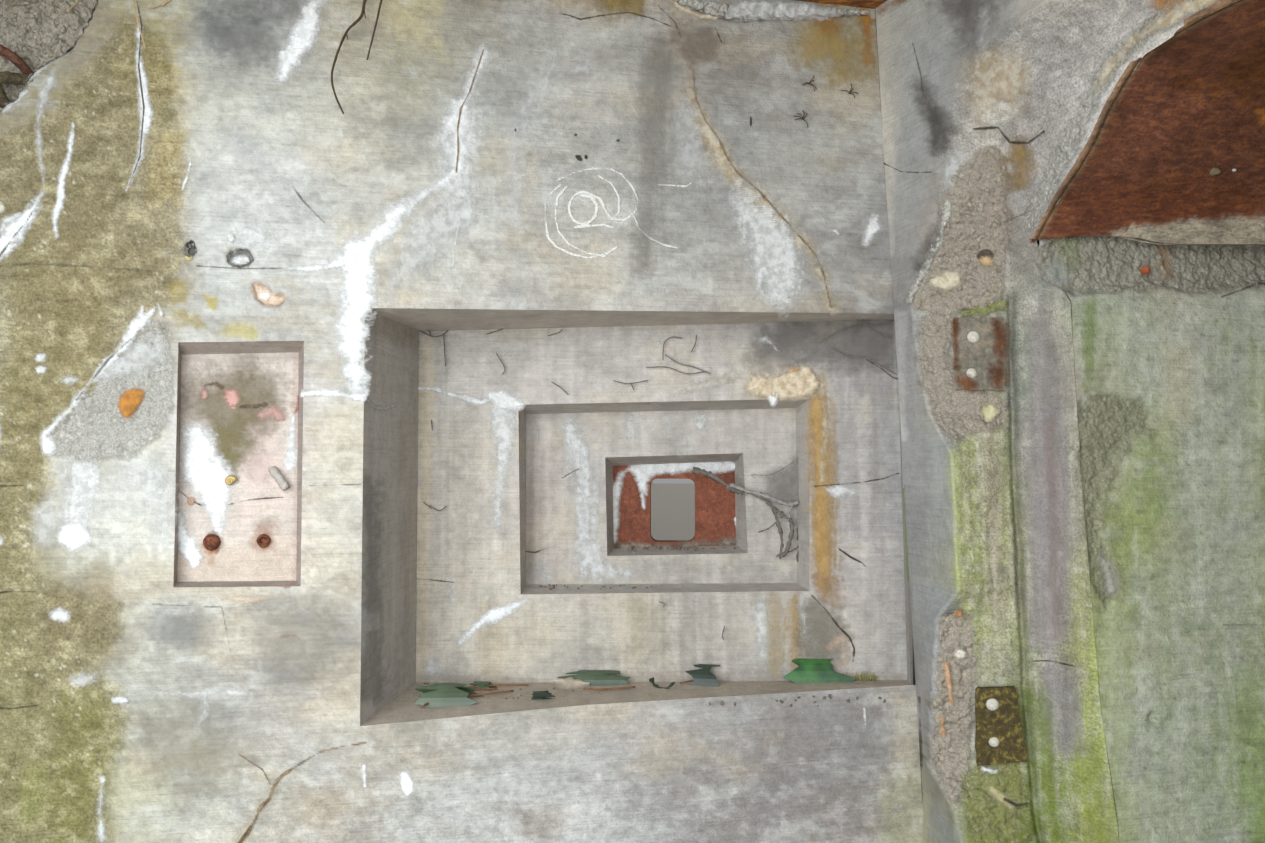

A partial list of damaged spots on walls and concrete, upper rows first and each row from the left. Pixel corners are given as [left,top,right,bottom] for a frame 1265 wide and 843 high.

spalling [0,0,97,112]
damp [0,124,74,259]
crack [693,78,834,310]
spalling [904,0,1217,439]
spalling [1036,236,1265,297]
spalling [41,304,174,461]
rust [951,318,977,389]
rust [990,320,1006,389]
damp [57,456,100,551]
rust [808,375,854,596]
damp [51,608,68,621]
crack [237,742,366,843]